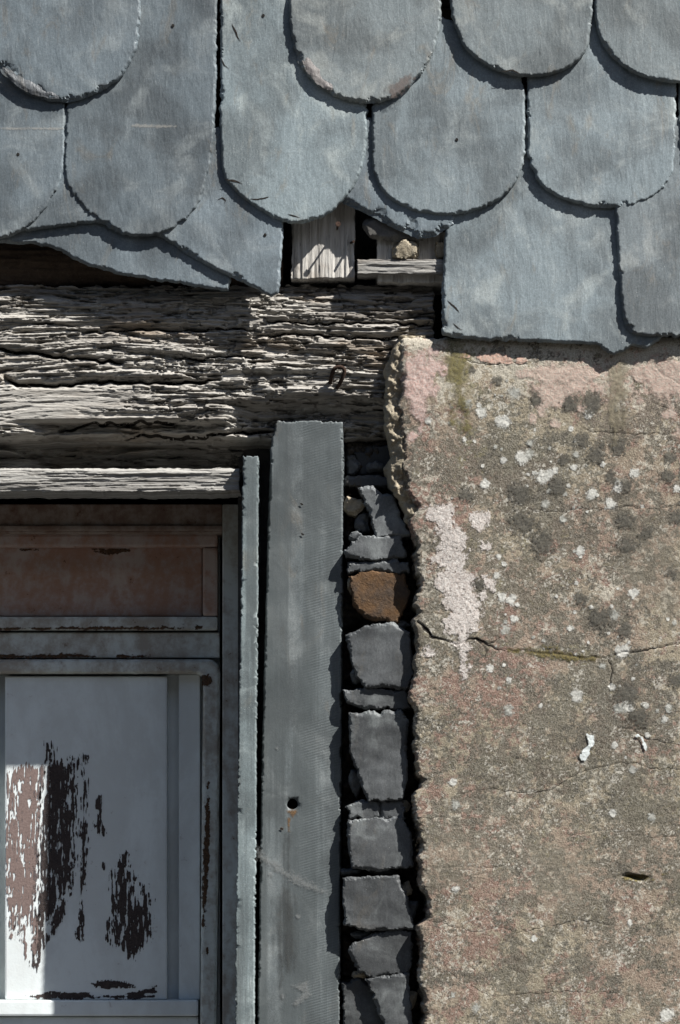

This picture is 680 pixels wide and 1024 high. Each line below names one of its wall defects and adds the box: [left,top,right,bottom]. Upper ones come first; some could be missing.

crack [418,622,528,660]
crack [573,643,675,683]
peeling [6,740,107,970]
peeling [102,850,156,961]
rust [200,781,211,927]
peeling [30,980,157,1000]